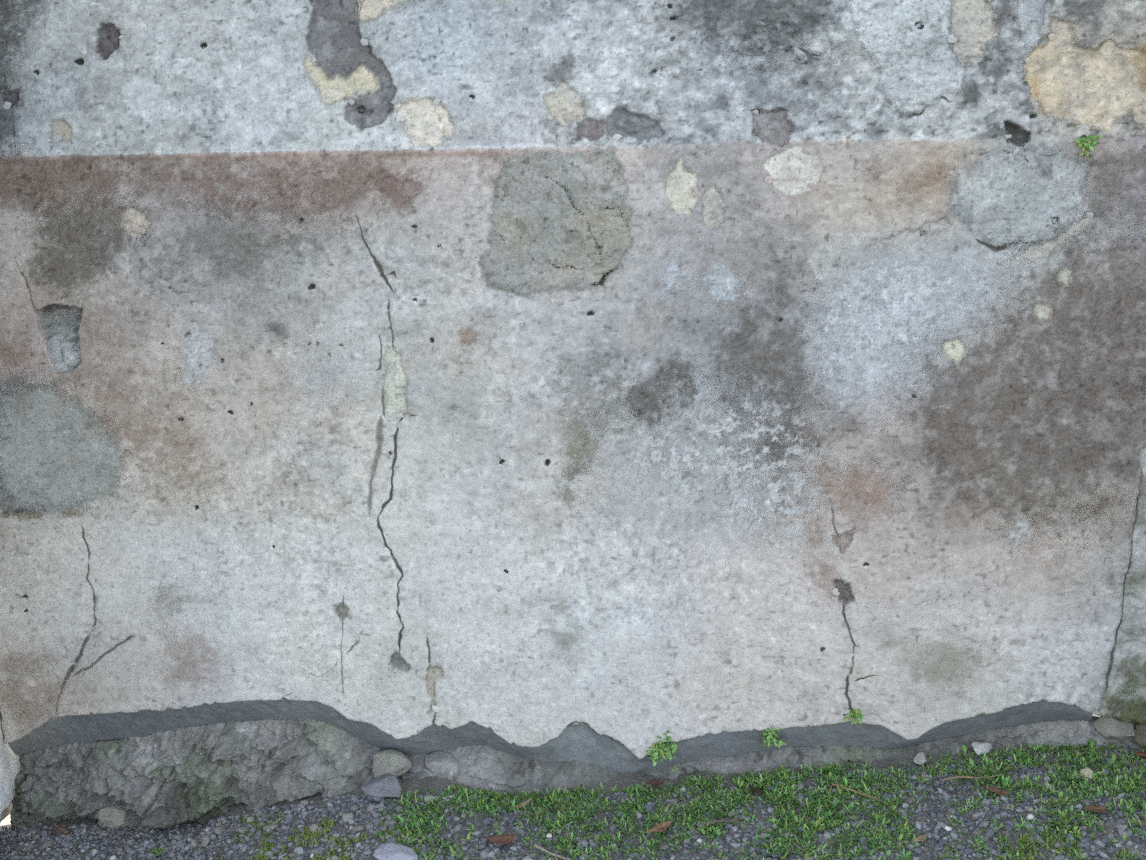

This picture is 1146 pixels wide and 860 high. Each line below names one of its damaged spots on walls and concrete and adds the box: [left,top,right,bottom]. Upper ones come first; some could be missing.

spalling [304,0,455,147]
spalling [1023,17,1146,130]
leakage [33,206,124,288]
spalling [1012,212,1094,262]
crack [355,212,430,667]
leakage [823,248,1000,407]
leakage [911,243,1146,544]
crack [56,527,135,713]
crack [831,506,841,551]
crack [842,602,879,711]
crack [1105,466,1143,692]